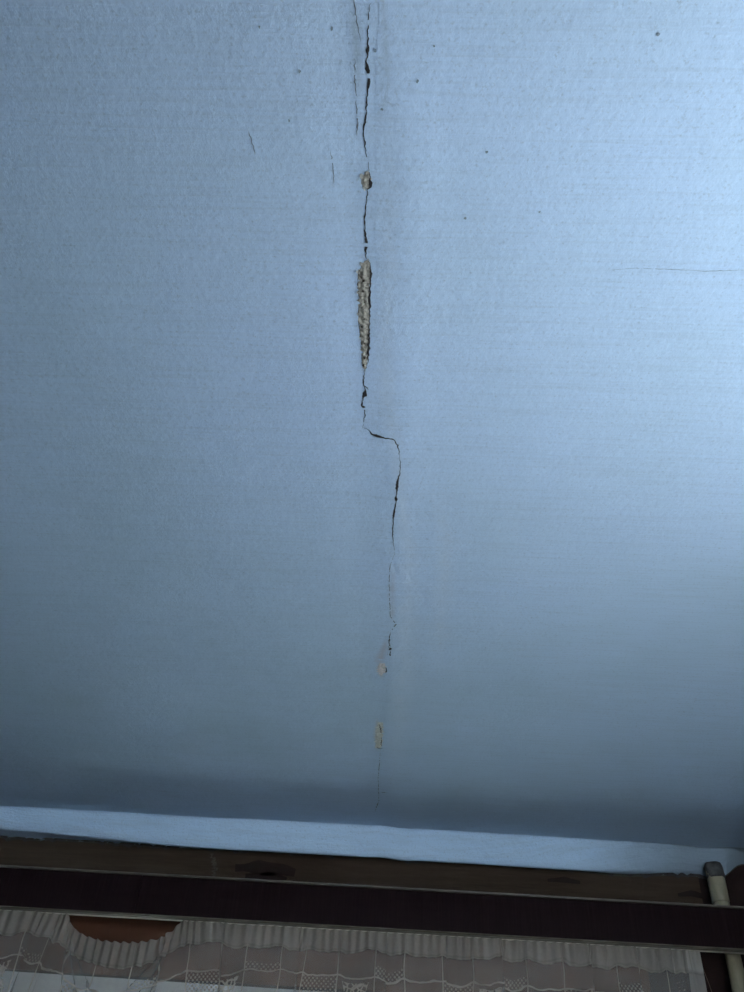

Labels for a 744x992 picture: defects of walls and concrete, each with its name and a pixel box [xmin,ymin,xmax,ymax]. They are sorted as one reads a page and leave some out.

crack [354,3,370,259]
spalling [356,259,372,372]
crack [361,369,401,656]